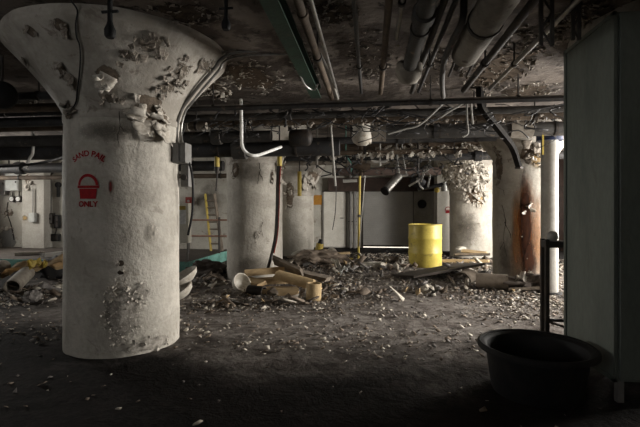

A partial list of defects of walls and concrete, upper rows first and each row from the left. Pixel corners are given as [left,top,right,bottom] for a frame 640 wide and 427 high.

peeling [91,32,216,147]
peeling [200,59,284,102]
peeling [459,15,585,97]
peeling [437,146,503,208]
rust [513,170,540,274]
spalling [99,260,169,353]